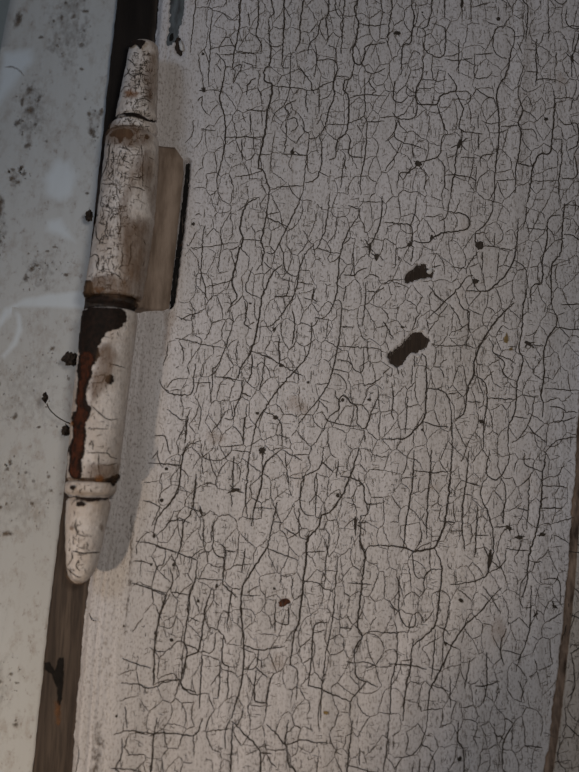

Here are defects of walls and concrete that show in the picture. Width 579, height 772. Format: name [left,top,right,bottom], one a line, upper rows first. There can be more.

peeling [166,0,184,56]
crack [88,51,158,307]
rust [68,306,127,490]
peeling [387,326,429,367]
peeling [404,265,432,284]
crack [555,611,579,772]